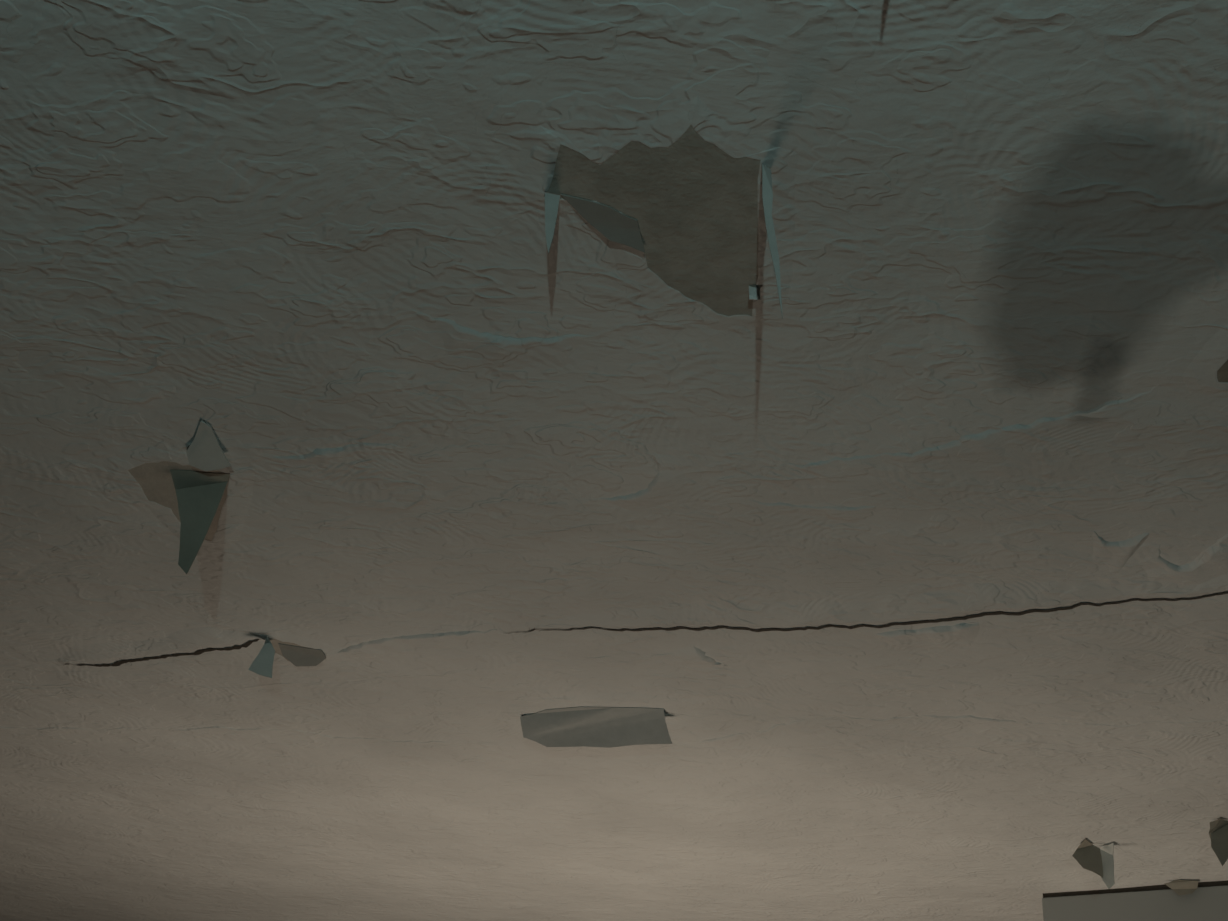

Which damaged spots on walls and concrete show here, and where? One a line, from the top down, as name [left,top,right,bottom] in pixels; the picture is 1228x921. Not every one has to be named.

peeling [510,95,800,332]
peeling [101,421,255,574]
peeling [248,629,346,678]
peeling [502,693,685,748]
peeling [1072,839,1115,889]
peeling [1209,818,1228,866]